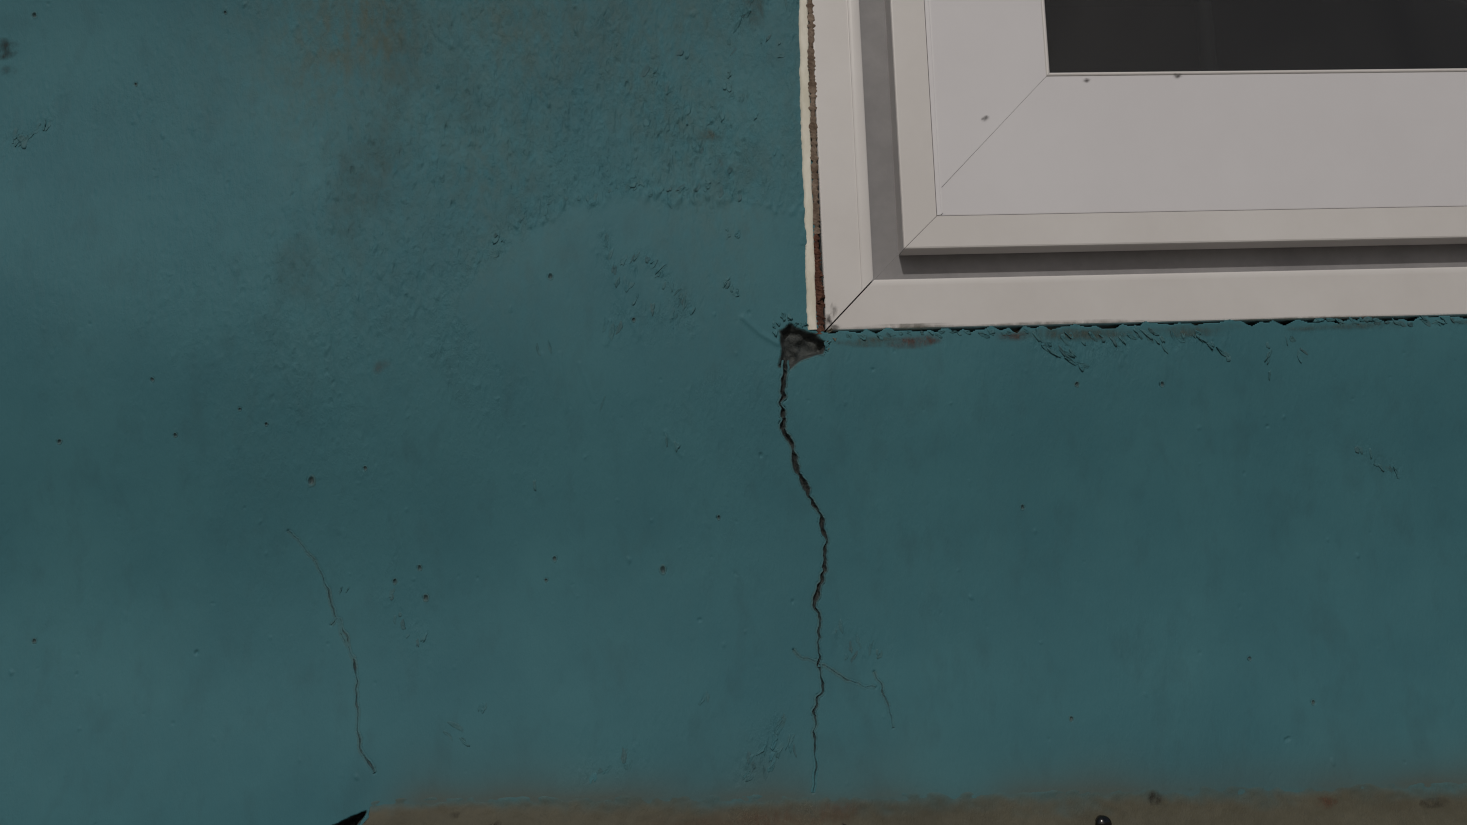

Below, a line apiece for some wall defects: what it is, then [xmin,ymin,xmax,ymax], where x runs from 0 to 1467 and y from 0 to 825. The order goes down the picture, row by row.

flaking render [772,312,836,372]
crack [777,360,895,793]